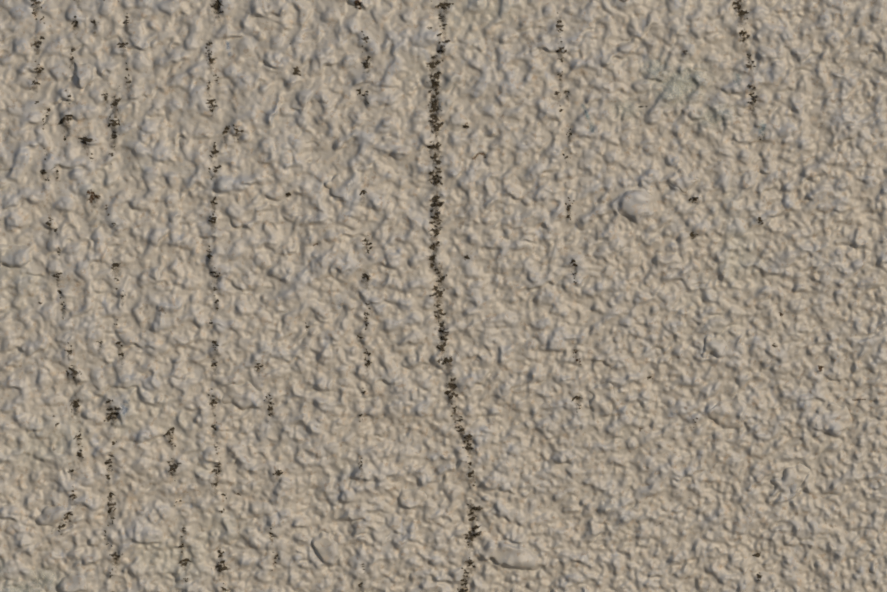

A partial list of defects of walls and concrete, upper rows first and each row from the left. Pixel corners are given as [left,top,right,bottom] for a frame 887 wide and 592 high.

damp [103,93,121,156]
damp [428,1,453,185]
damp [429,196,452,365]
damp [445,378,473,450]
damp [104,492,120,560]
damp [459,504,483,592]